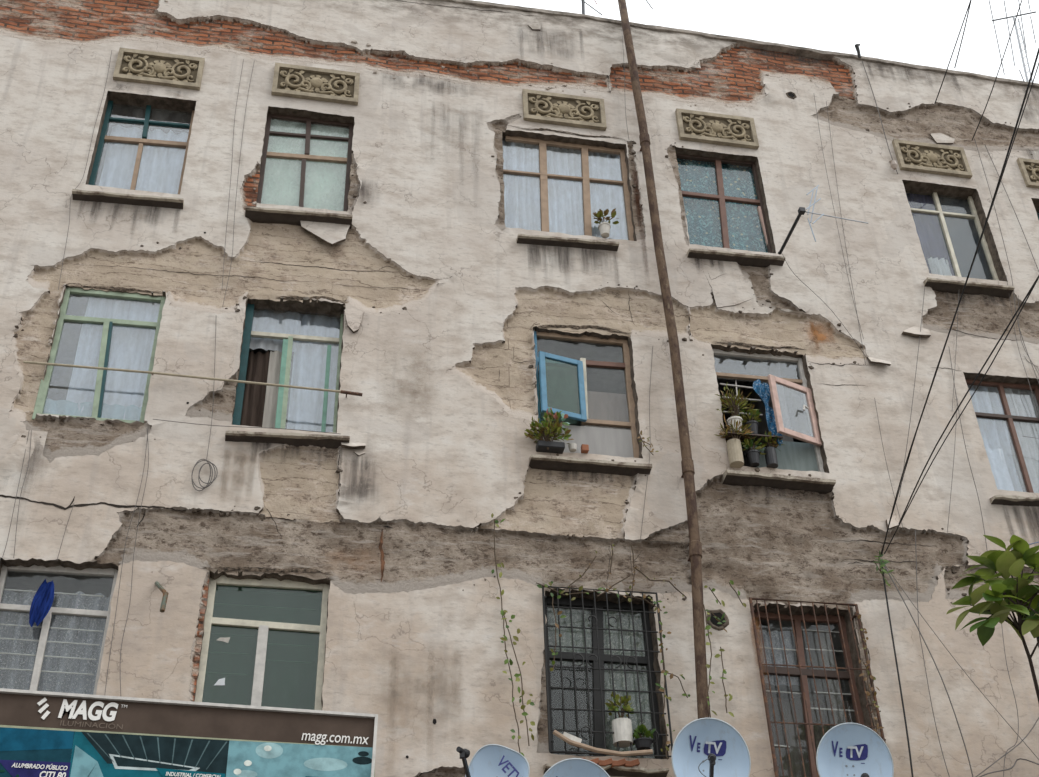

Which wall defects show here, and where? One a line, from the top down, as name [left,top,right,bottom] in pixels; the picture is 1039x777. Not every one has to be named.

flaking render [0,0,1039,155]
flaking render [9,153,451,463]
flaking render [445,264,891,421]
crack [0,495,238,526]
flaking render [95,442,1039,737]
flaking render [415,766,466,777]
flaking render [536,650,551,754]